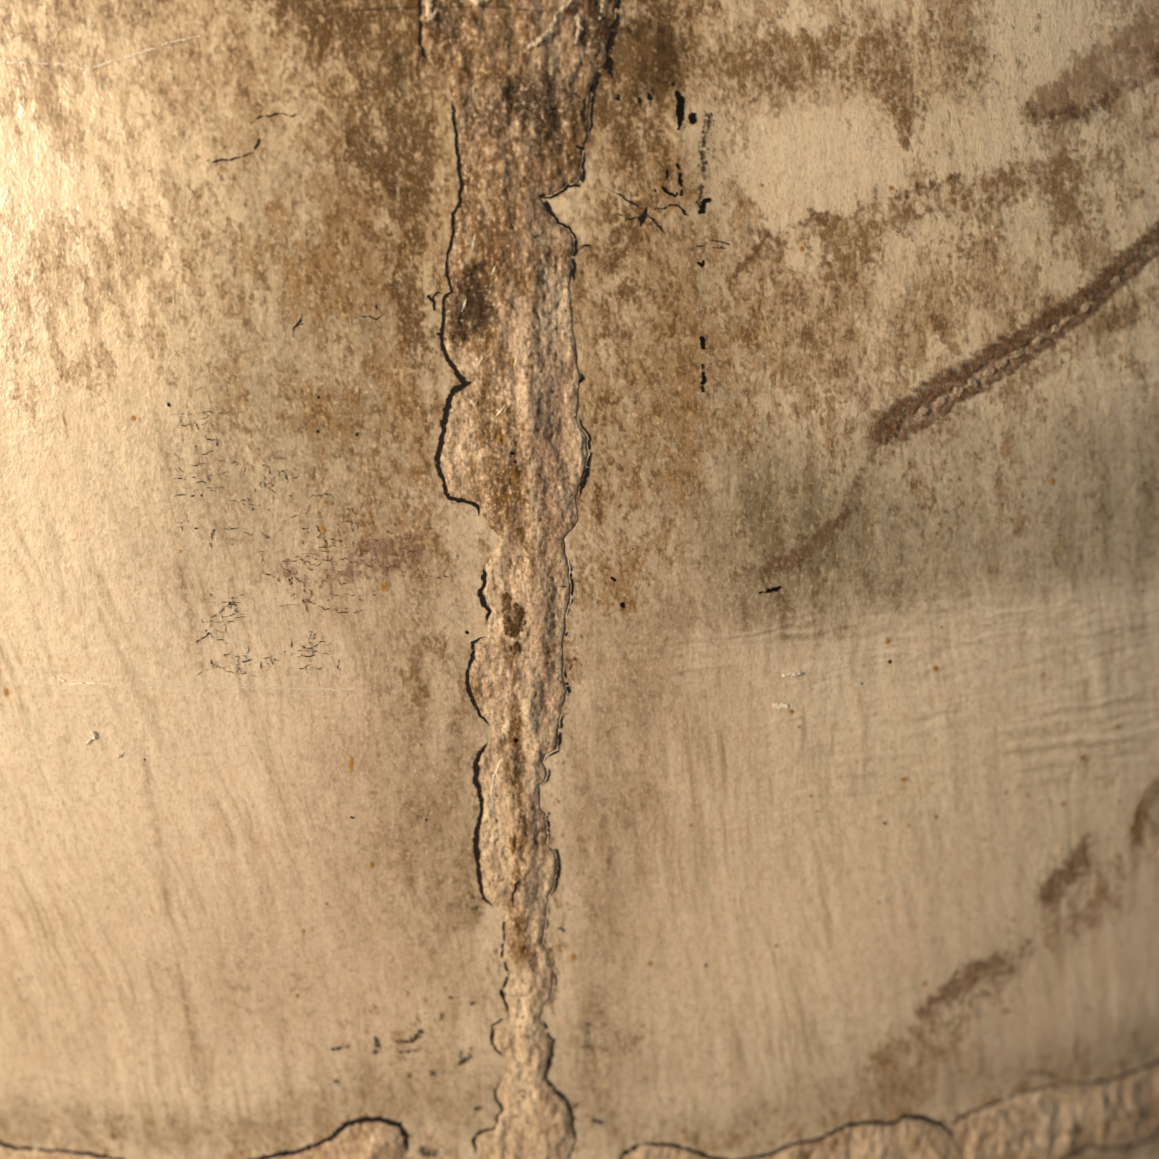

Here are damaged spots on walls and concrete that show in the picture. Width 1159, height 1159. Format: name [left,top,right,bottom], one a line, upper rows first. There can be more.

crack [535,0,621,282]
damp [612,20,985,150]
damp [1026,10,1159,139]
damp [731,147,1125,285]
crack [432,102,479,516]
damp [452,259,497,341]
damp [853,221,1159,492]
crack [174,389,522,1159]
crack [542,561,576,1159]
damp [1035,835,1098,908]
crack [0,1141,124,1159]
crack [619,1061,1159,1159]